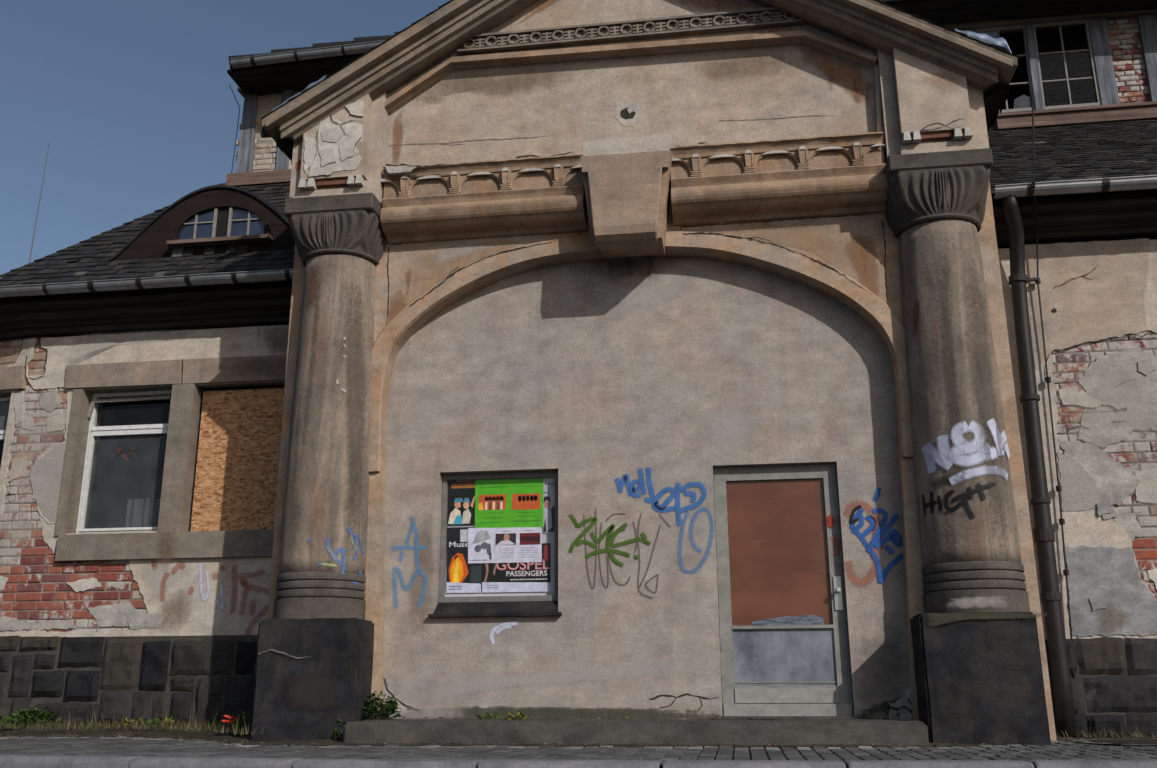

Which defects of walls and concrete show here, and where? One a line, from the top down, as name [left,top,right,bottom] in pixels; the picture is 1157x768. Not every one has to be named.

flaking render [253,100,363,178]
crack [680,213,888,305]
flaking render [0,336,165,632]
flaking render [1050,331,1157,600]
crack [649,693,719,713]